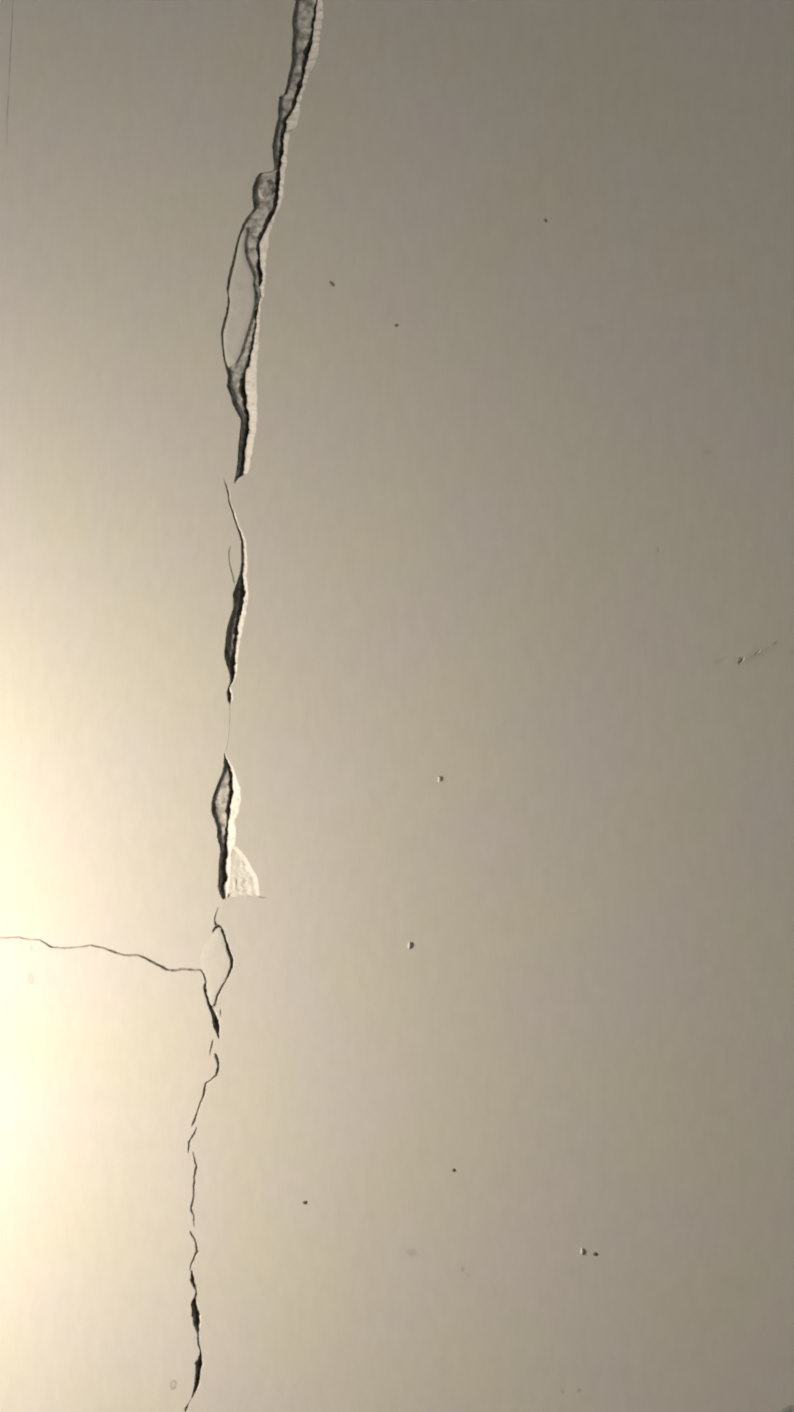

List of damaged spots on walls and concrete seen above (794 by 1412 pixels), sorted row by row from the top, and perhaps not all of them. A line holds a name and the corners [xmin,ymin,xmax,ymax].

crack [0,0,323,1412]
peeling [227,845,267,898]